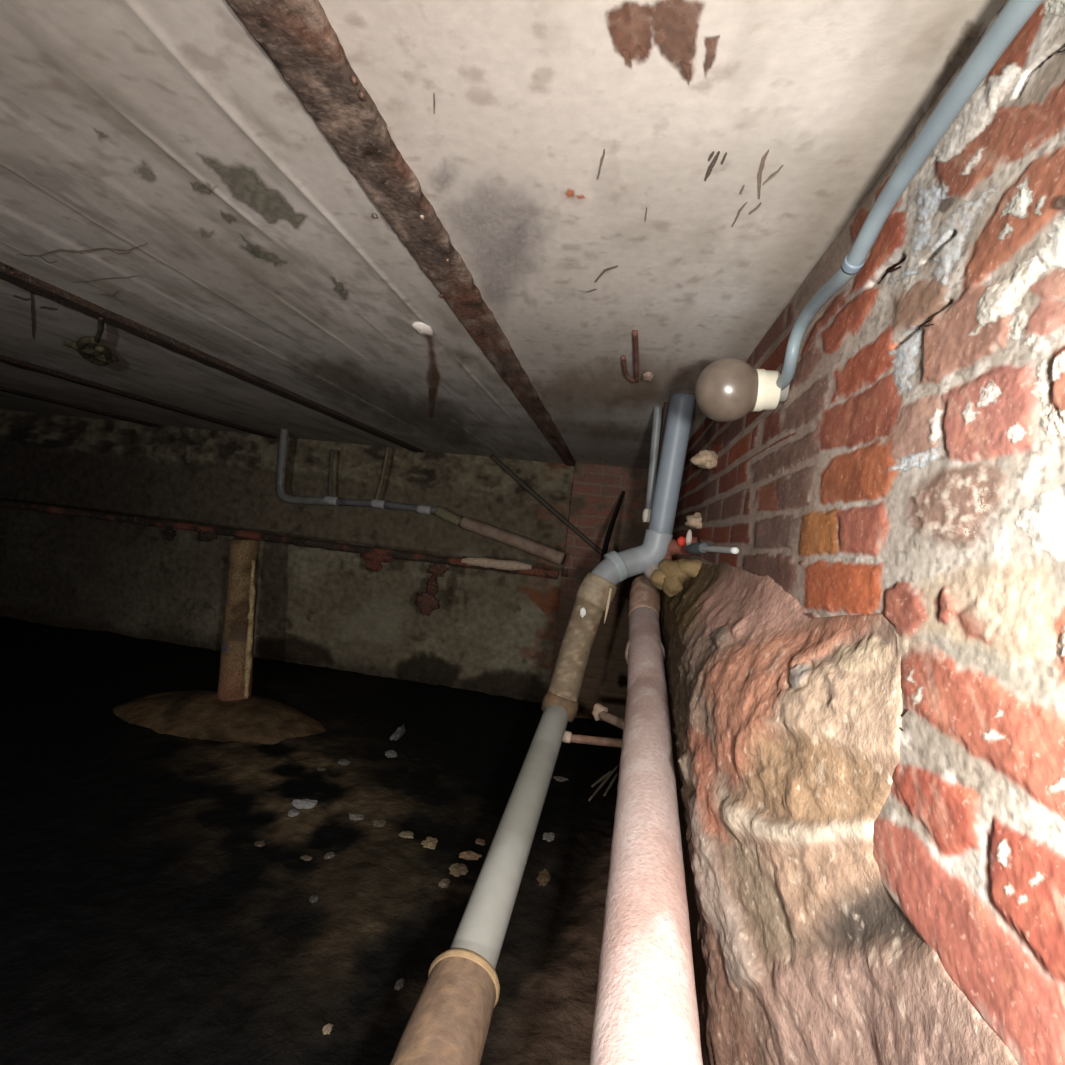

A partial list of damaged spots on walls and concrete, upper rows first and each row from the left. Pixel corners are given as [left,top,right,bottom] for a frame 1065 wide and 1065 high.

water stain [931,23,980,106]
rust [427,335,439,416]